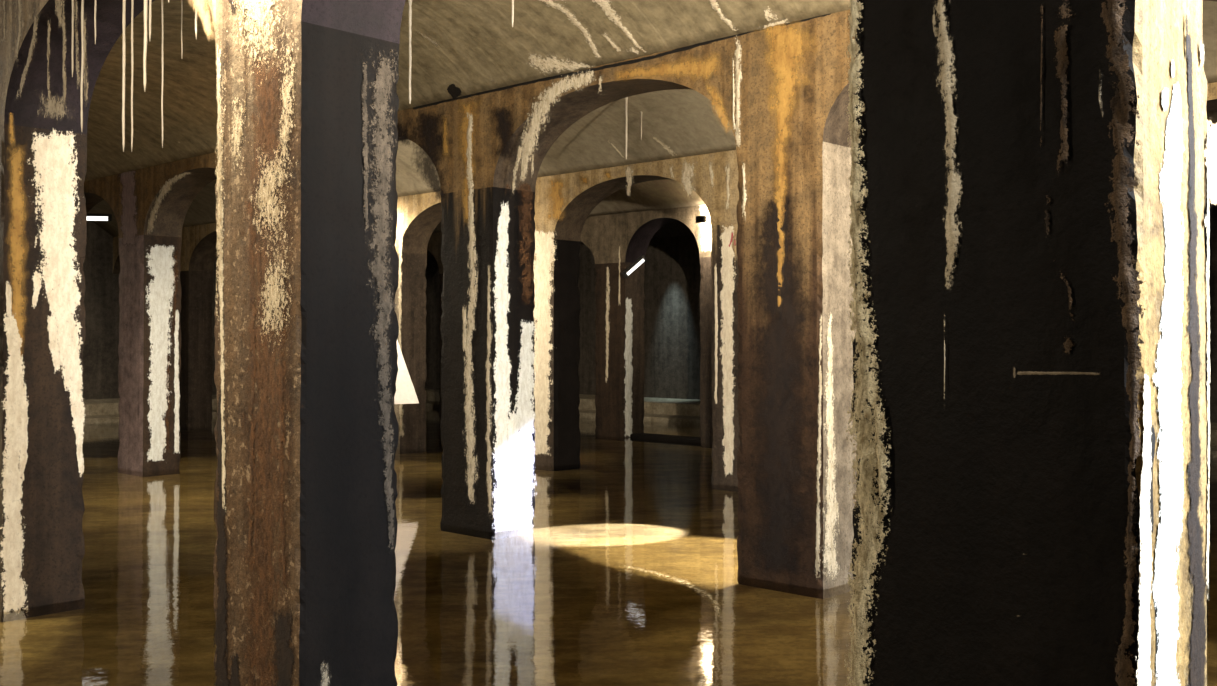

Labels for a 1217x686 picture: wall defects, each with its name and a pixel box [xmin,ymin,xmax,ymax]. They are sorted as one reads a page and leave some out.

corrosion [9,113,25,357]
damp [3,0,88,120]
peeling [27,128,86,477]
peeling [145,245,180,462]
corrosion [232,44,301,686]
corrosion [443,104,474,219]
corrosion [505,183,536,303]
damp [528,0,645,76]
corrosion [616,56,729,129]
corrosion [766,25,805,307]
peeling [873,378,891,525]
peeling [1136,59,1185,686]